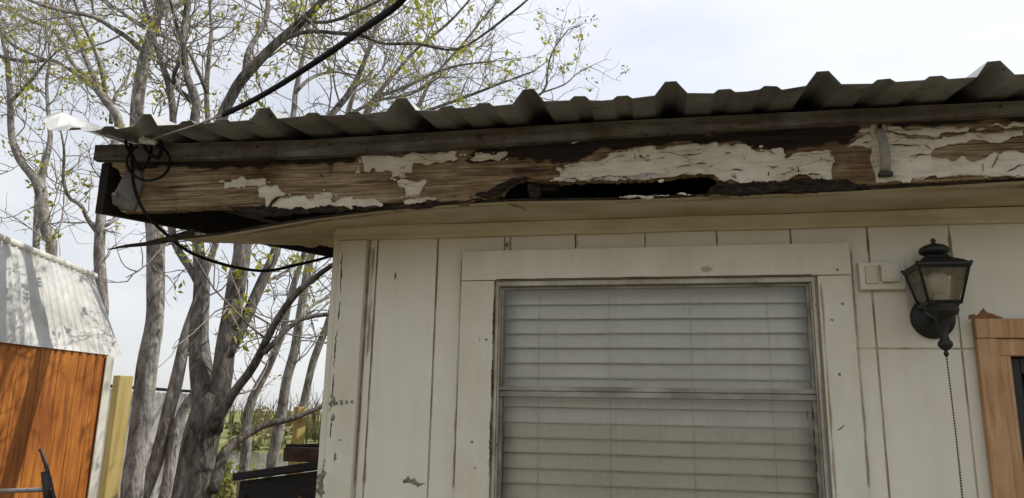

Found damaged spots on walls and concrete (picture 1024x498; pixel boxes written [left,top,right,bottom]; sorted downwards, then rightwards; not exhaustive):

peeling [219,176,383,209]
peeling [355,150,508,205]
peeling [550,142,835,199]
peeling [847,122,1024,183]
peeling [329,394,353,421]